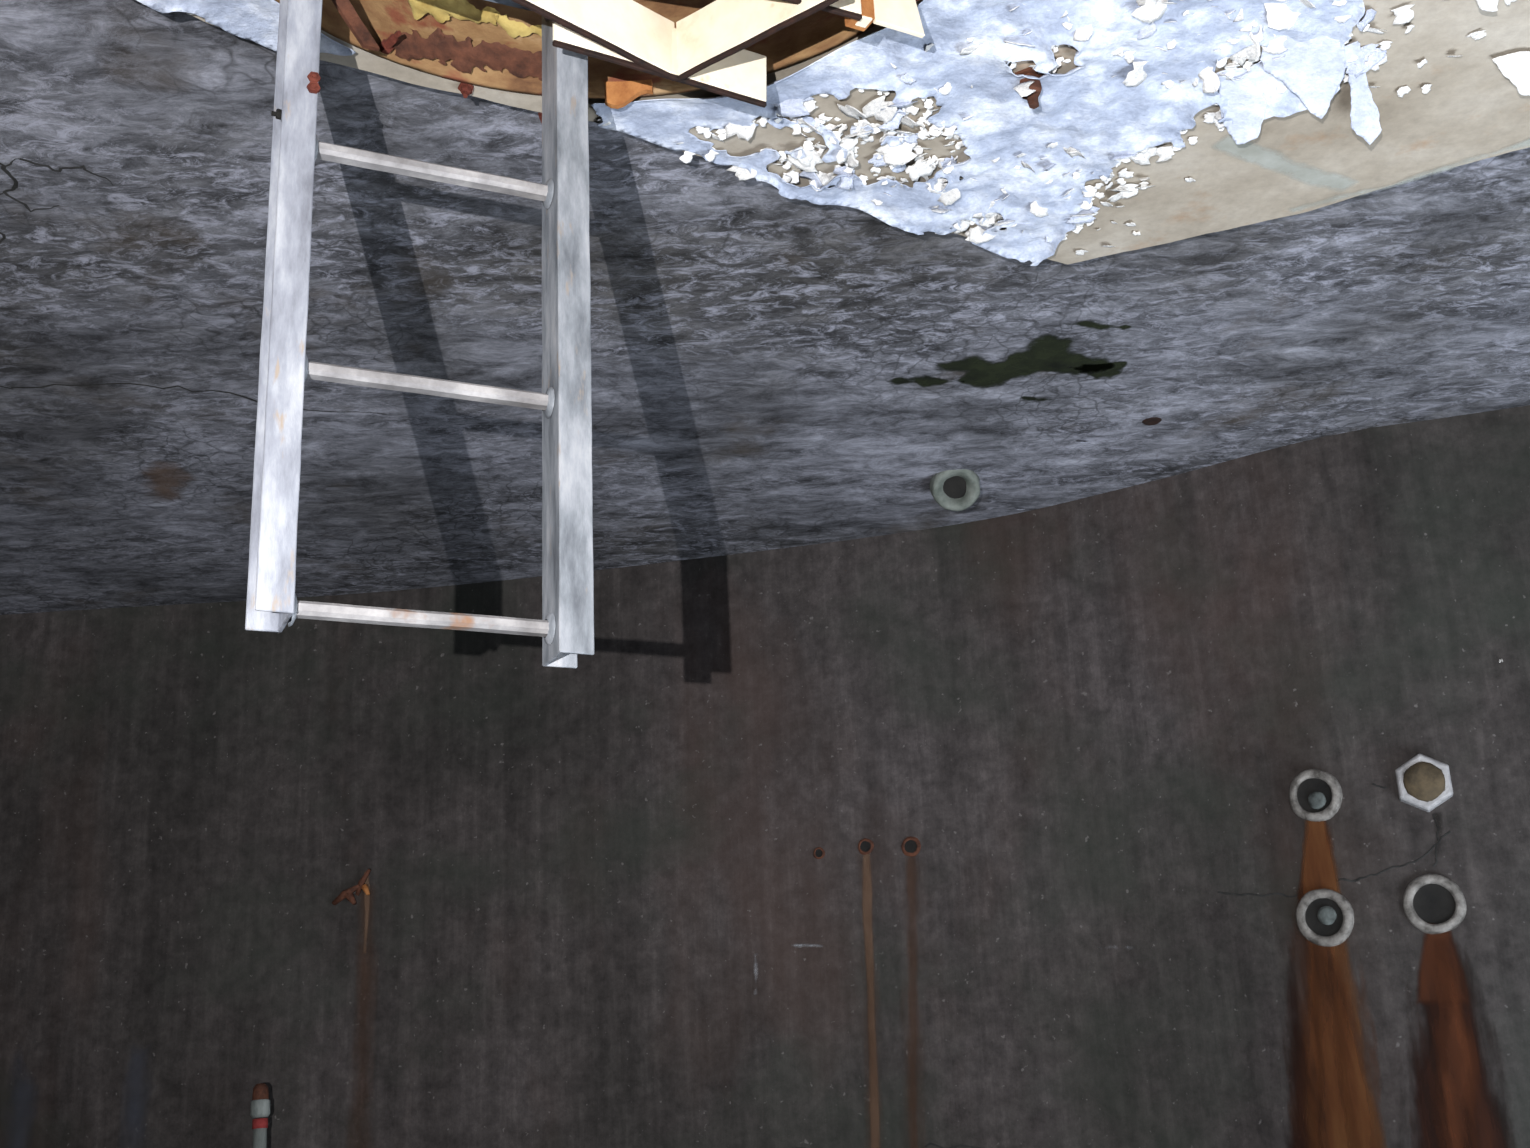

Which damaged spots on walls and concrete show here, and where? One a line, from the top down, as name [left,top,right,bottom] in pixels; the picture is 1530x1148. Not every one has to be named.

peeling [136,0,280,52]
corrosion [385,28,542,80]
peeling [1397,59,1432,97]
peeling [1476,0,1517,12]
peeling [1492,51,1530,96]
peeling [591,0,1415,266]
crack [0,158,114,244]
damp [888,321,1131,388]
corrosion [1300,820,1339,899]
corrosion [863,854,879,1148]
corrosion [1290,938,1383,1148]
corrosion [1413,923,1510,1148]